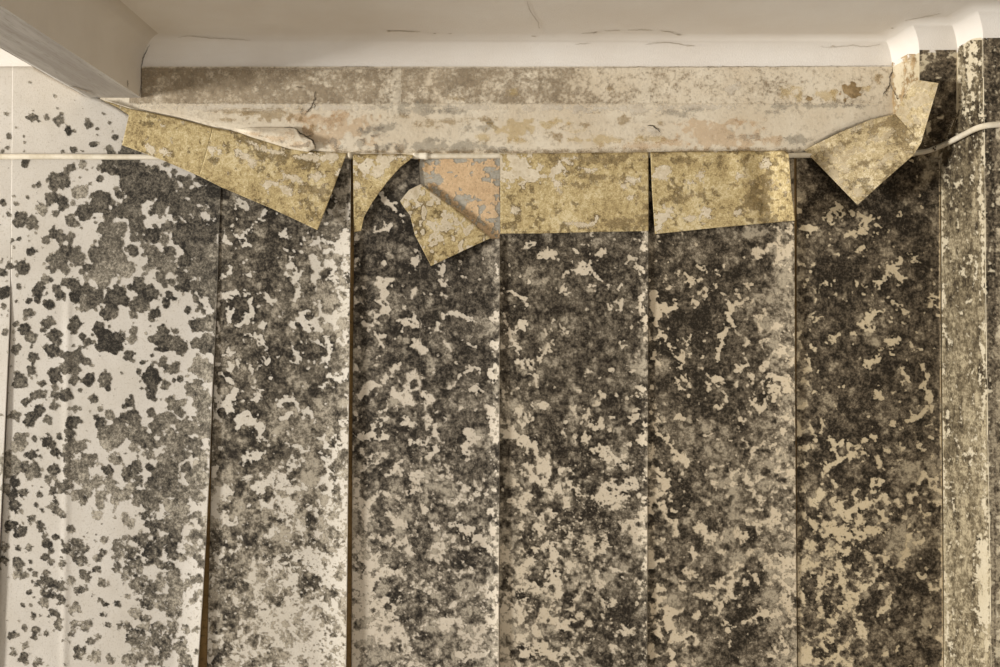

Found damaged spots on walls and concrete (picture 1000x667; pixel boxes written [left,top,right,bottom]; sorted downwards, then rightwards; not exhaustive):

mould [0,127,30,168]
mould [25,107,76,136]
mould [84,118,141,154]
peeling [145,102,383,112]
water stain [129,67,634,104]
flaking render [839,81,862,104]
peeling [892,54,918,114]
water stain [917,38,1000,150]
peeling [419,159,500,239]
mould [0,158,351,667]
water stain [352,128,1000,667]